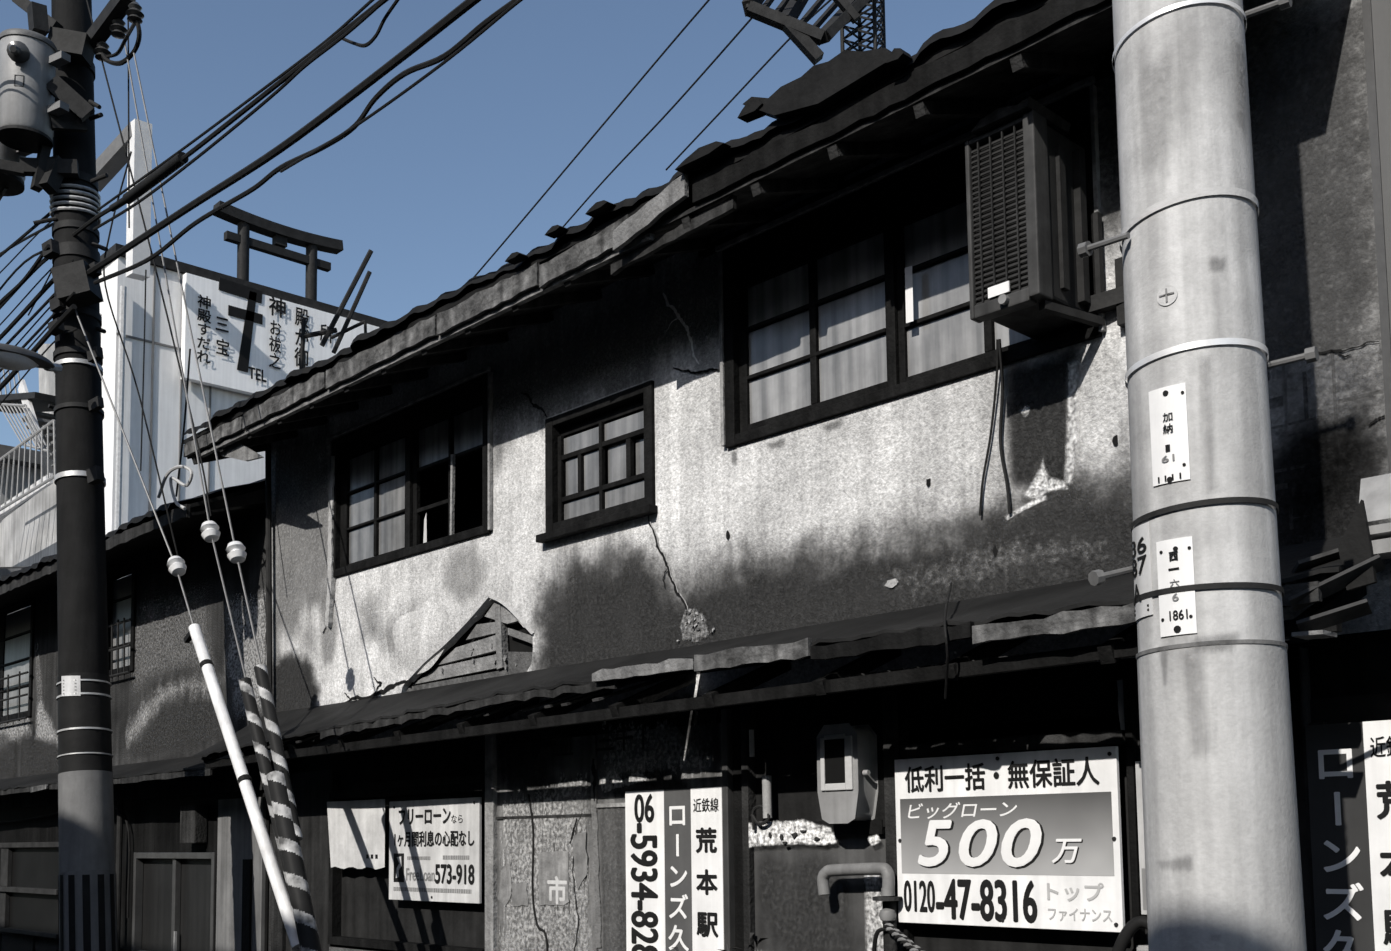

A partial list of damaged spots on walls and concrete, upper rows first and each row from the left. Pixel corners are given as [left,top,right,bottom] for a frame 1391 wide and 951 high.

crack [663,293,720,374]
leakage [534,347,1133,670]
leakage [1273,412,1391,547]
crack [648,516,688,611]
leakage [1285,570,1342,585]
spalling [677,609,715,642]
leakage [618,663,768,682]
peeling [749,820,836,846]